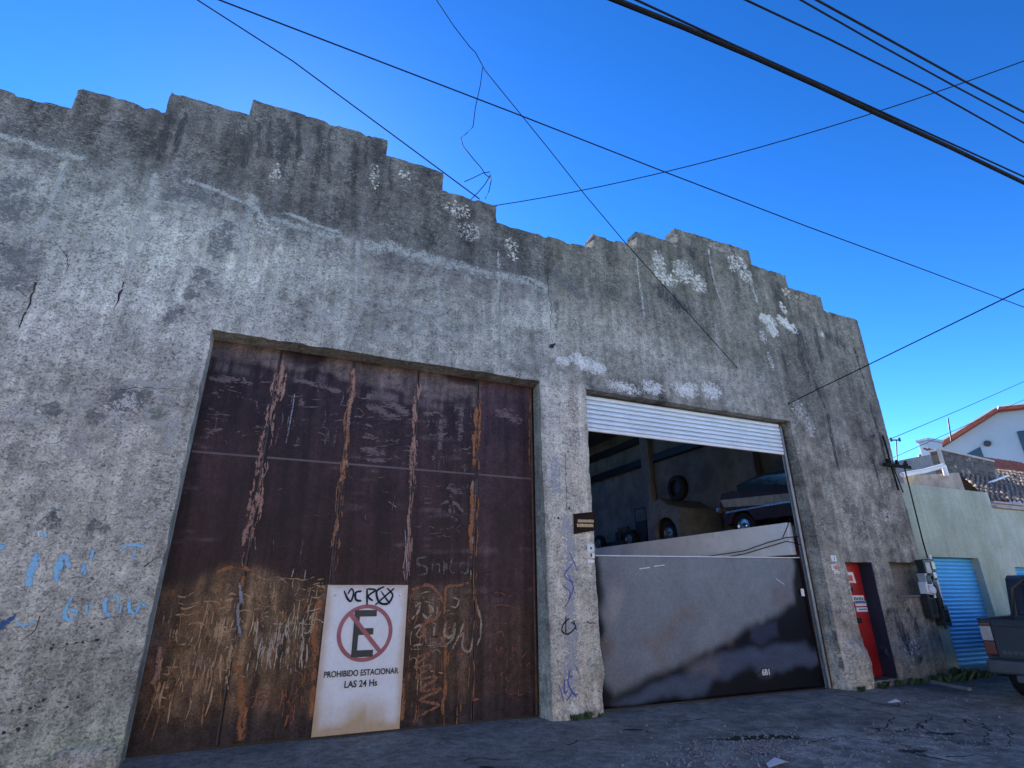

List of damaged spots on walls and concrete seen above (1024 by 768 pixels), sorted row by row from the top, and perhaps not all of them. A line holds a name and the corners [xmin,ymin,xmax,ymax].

leakage [154,112,189,160]
leakage [240,116,302,176]
crack [18,282,37,329]
leakage [126,173,588,357]
leakage [636,259,691,318]
corrosion [272,365,287,410]
corrosion [339,368,357,481]
corrosion [242,428,265,546]
corrosion [468,406,481,559]
corrosion [255,598,323,719]